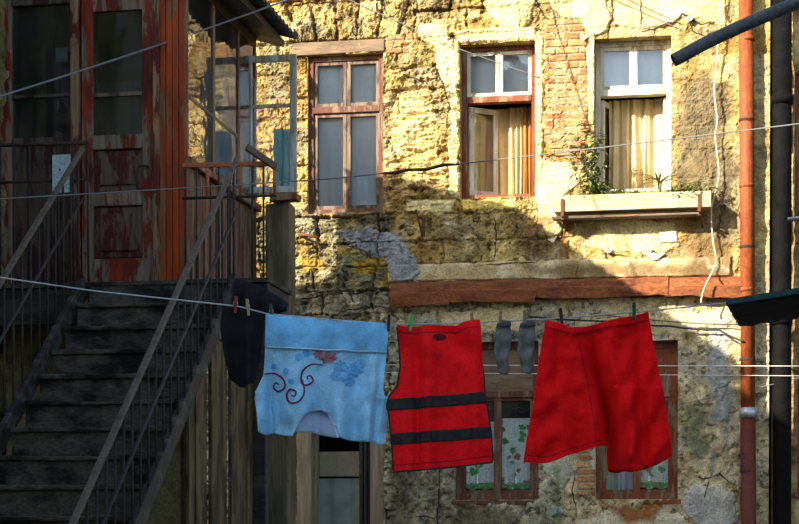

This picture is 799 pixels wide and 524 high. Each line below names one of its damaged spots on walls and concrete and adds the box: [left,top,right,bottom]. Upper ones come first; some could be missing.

crack [640,0,714,36]
flaking render [385,0,730,243]
peeling [574,219,680,260]
spalling [335,248,385,275]